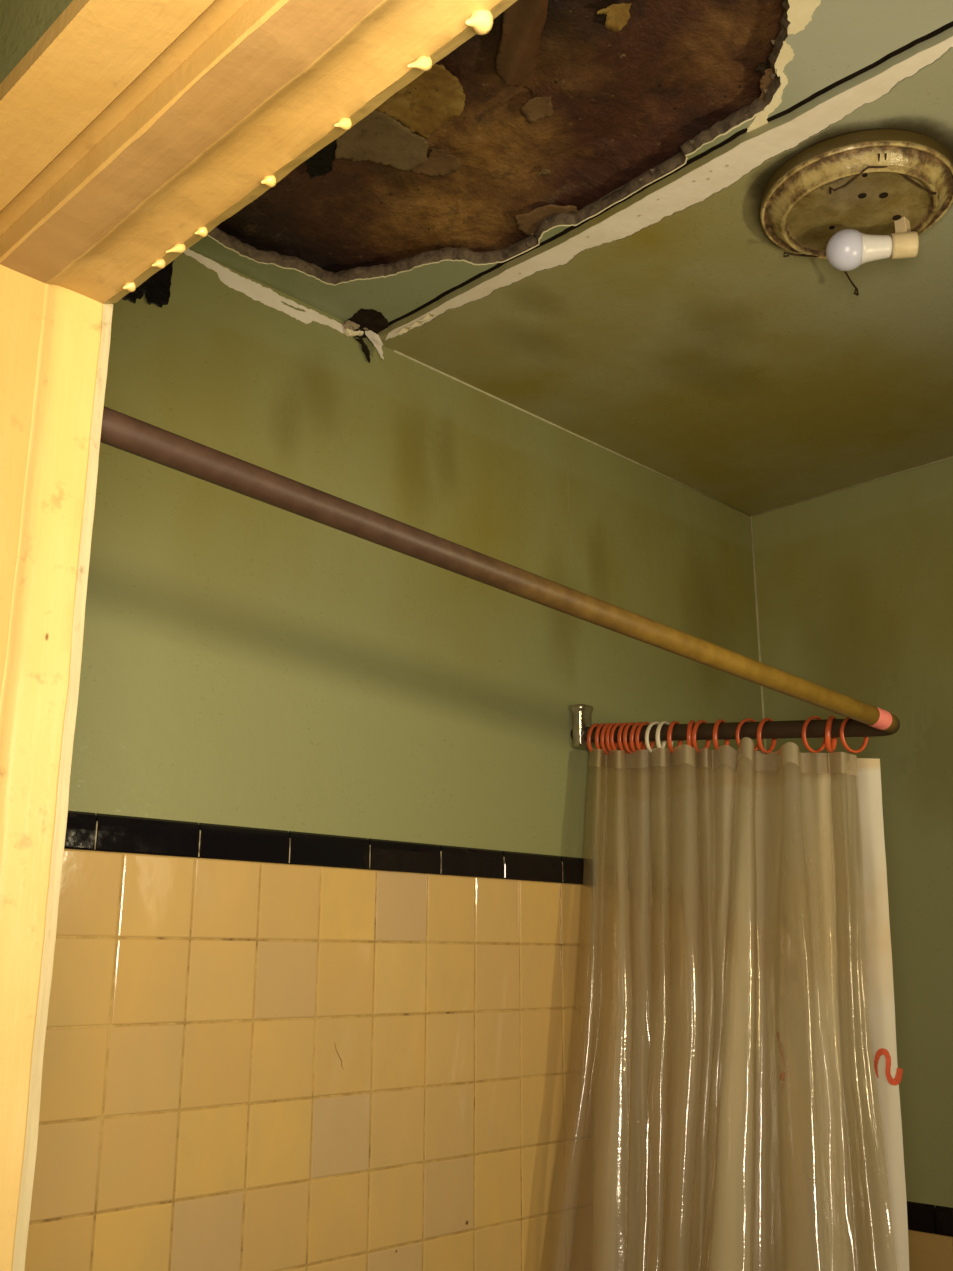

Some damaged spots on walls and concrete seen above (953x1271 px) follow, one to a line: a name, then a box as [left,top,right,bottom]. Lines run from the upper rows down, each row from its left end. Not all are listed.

peeling [184,0,953,363]